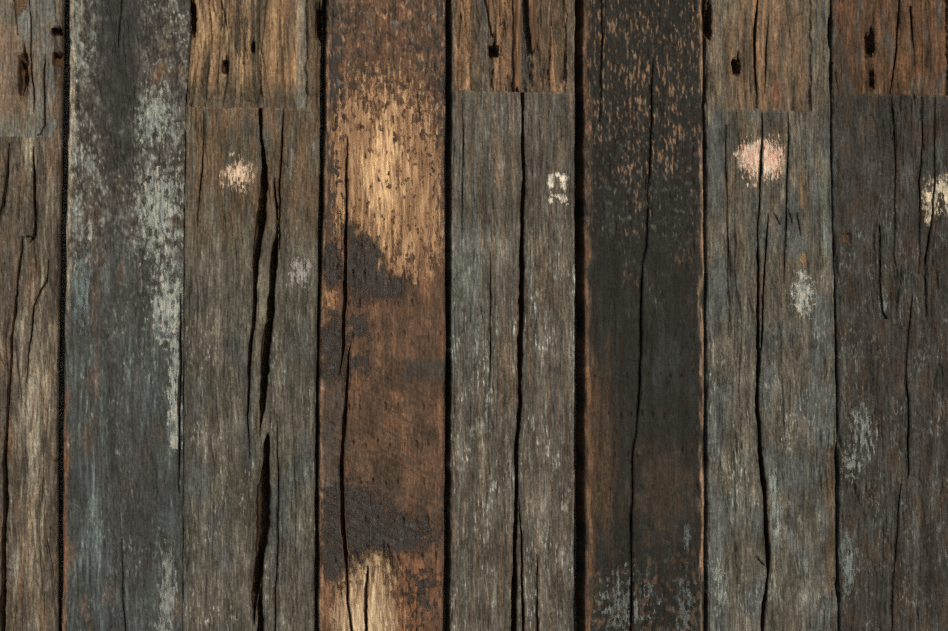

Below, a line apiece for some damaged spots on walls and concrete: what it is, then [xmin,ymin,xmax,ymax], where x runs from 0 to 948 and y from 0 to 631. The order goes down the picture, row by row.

crack [0,0,50,631]
crack [245,108,285,631]
crack [338,136,369,631]
crack [486,251,494,391]
crack [509,92,540,631]
crack [629,59,654,631]
crack [752,0,801,631]